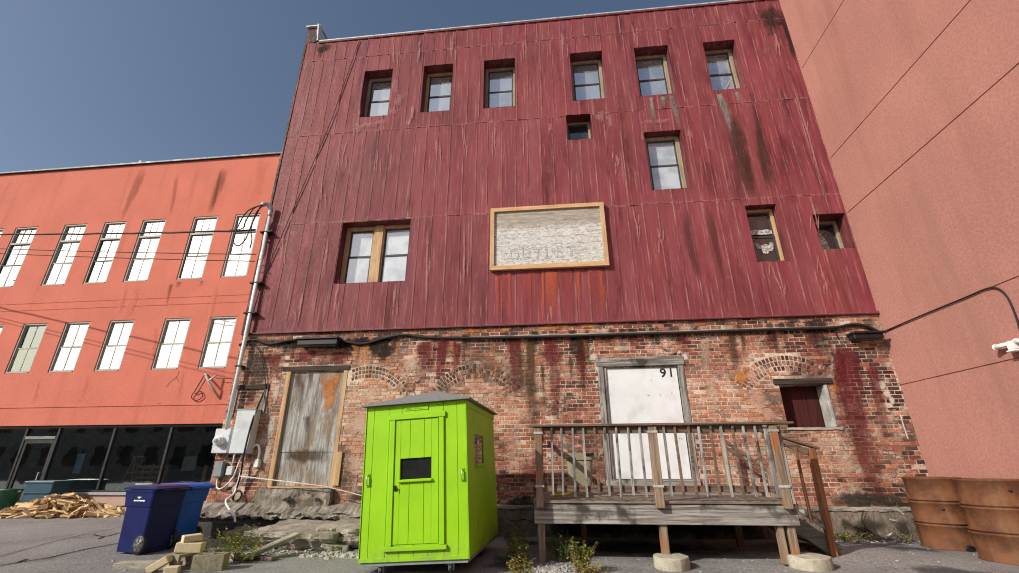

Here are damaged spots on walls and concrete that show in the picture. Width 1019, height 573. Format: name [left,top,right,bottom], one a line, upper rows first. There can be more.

damp [717,94,770,183]
rust [321,374,340,409]
damp [434,335,467,366]
damp [518,330,599,396]
damp [834,354,845,387]
damp [867,366,882,406]